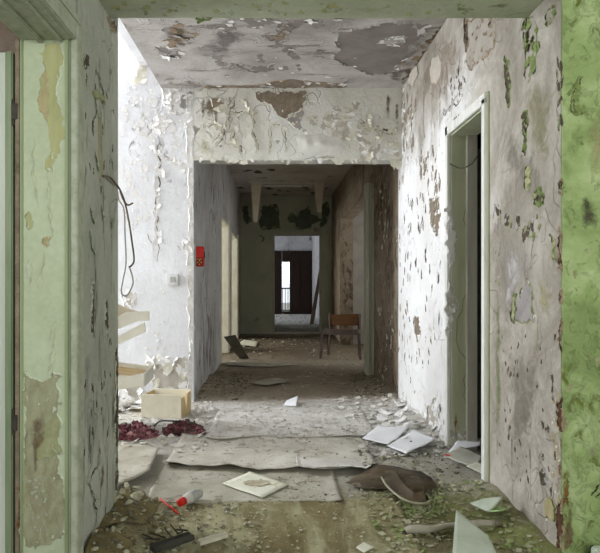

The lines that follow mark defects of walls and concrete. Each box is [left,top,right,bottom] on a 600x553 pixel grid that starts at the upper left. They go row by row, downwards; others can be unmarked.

peeling [37,41,65,173]
crack [206,97,289,154]
peeling [316,3,431,76]
peeling [443,4,496,97]
peeling [503,56,511,108]
peeling [521,5,557,83]
peeling [84,42,459,394]
peeling [495,255,536,324]
peeling [19,371,66,549]